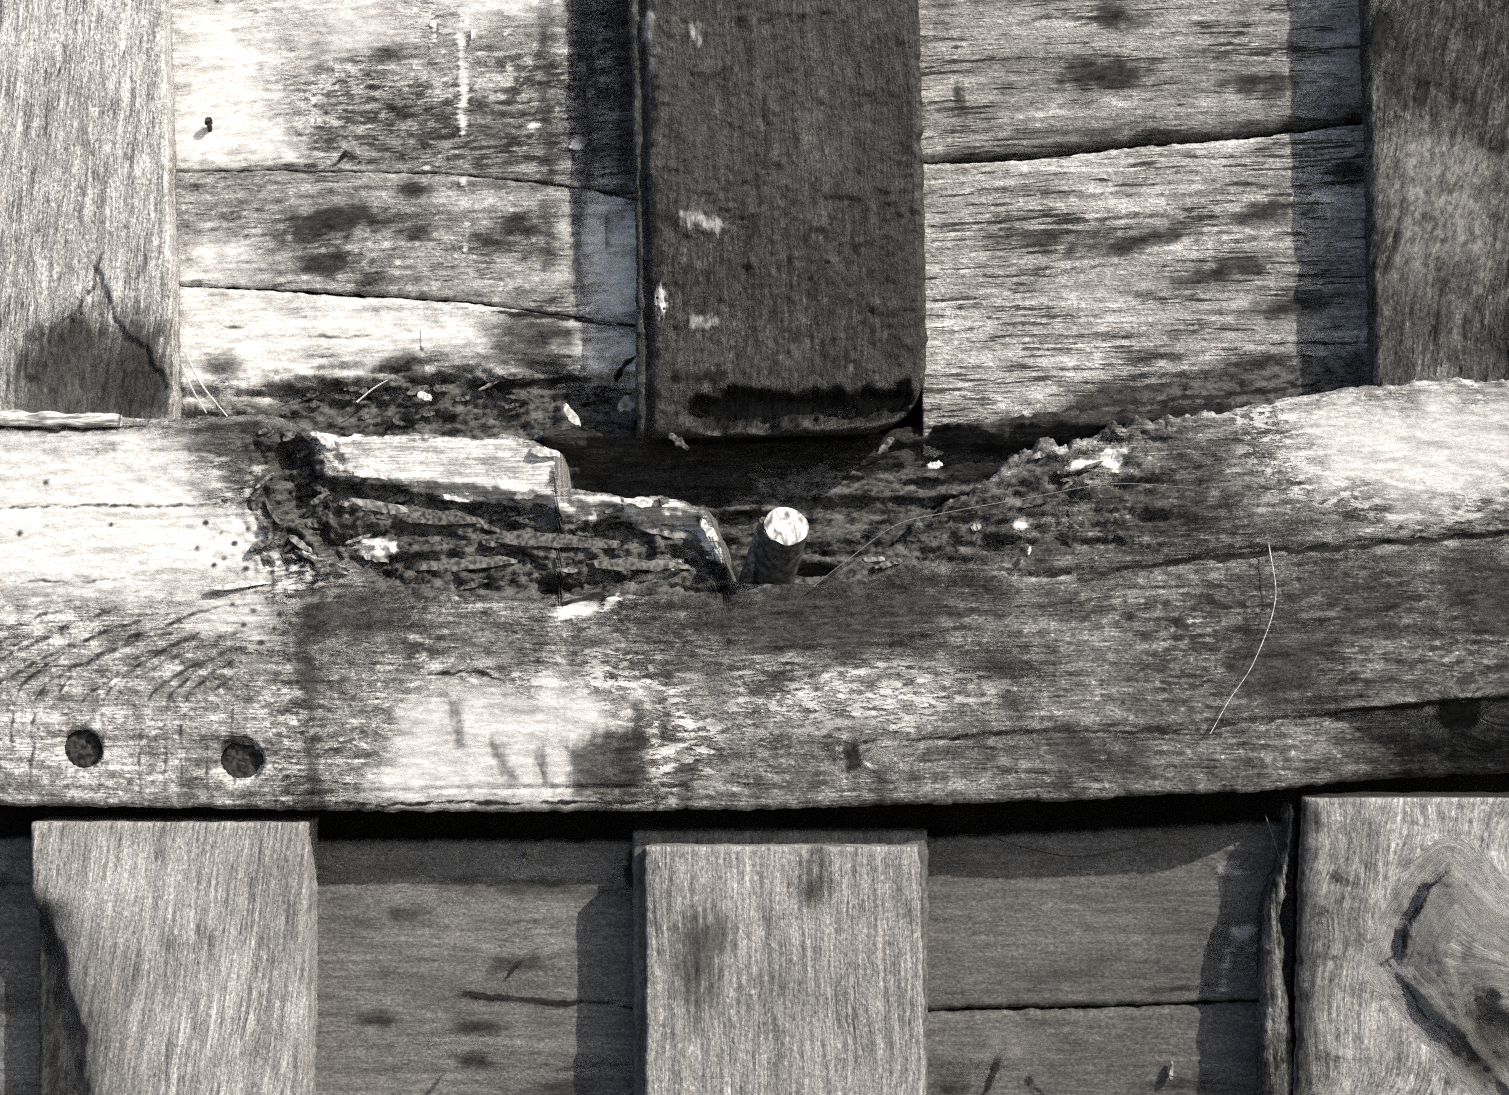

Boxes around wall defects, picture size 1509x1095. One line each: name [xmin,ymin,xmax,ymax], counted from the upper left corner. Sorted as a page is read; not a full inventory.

damp [285,0,634,274]
damp [259,205,435,286]
damp [372,353,425,387]
peeling [406,315,607,409]
spalling [244,384,730,612]
spalling [827,451,1104,602]
crack [825,695,1509,777]